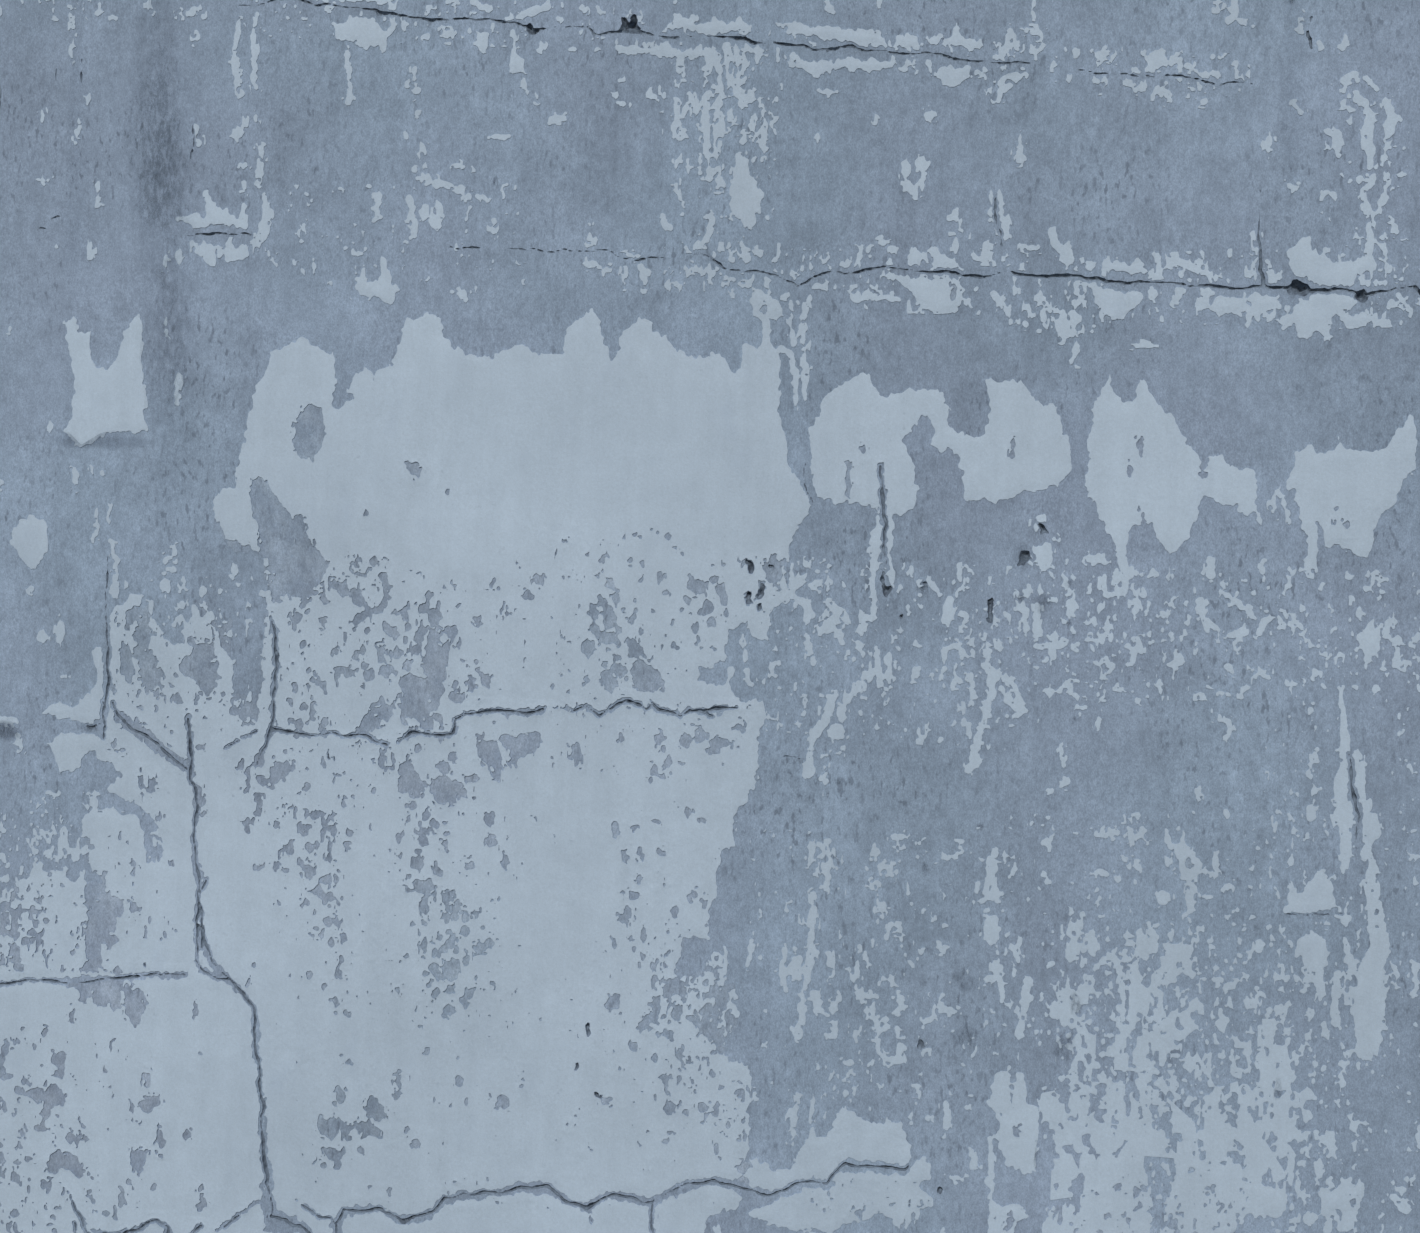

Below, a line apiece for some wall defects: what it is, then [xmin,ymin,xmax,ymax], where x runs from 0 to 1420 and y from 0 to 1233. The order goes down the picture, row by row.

peeling [20,0,156,65]
peeling [173,4,208,47]
crack [238,0,1030,65]
peeling [1294,9,1350,55]
peeling [71,93,91,145]
peeling [87,240,98,260]
crack [450,246,664,261]
crack [703,190,1414,296]
peeling [46,314,149,447]
crack [879,465,888,564]
peeling [36,614,68,647]
crack [0,557,909,1233]